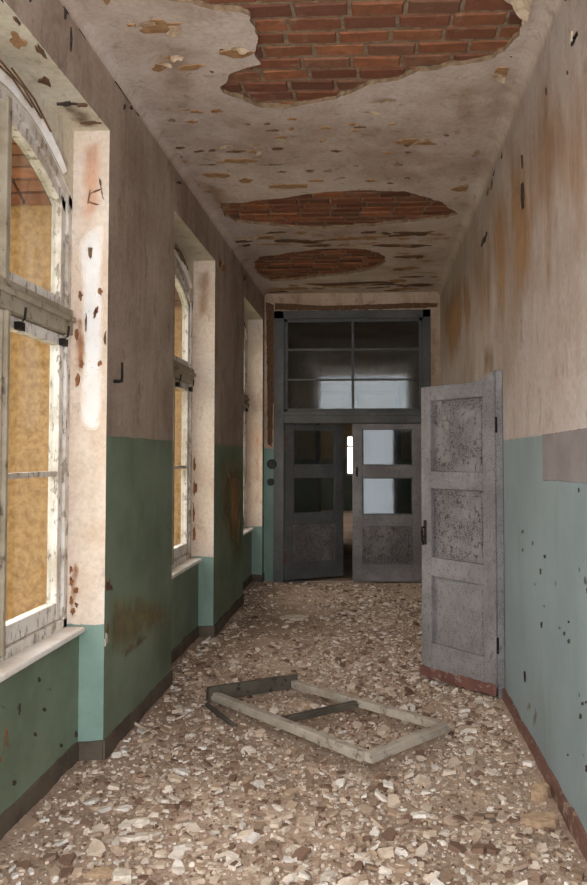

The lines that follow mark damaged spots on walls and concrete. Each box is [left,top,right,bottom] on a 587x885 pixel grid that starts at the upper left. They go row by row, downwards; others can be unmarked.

flaking render [126,19,183,38]
flaking render [151,55,214,76]
flaking render [164,0,532,193]
peeling [82,227,102,427]
flaking render [219,170,458,447]